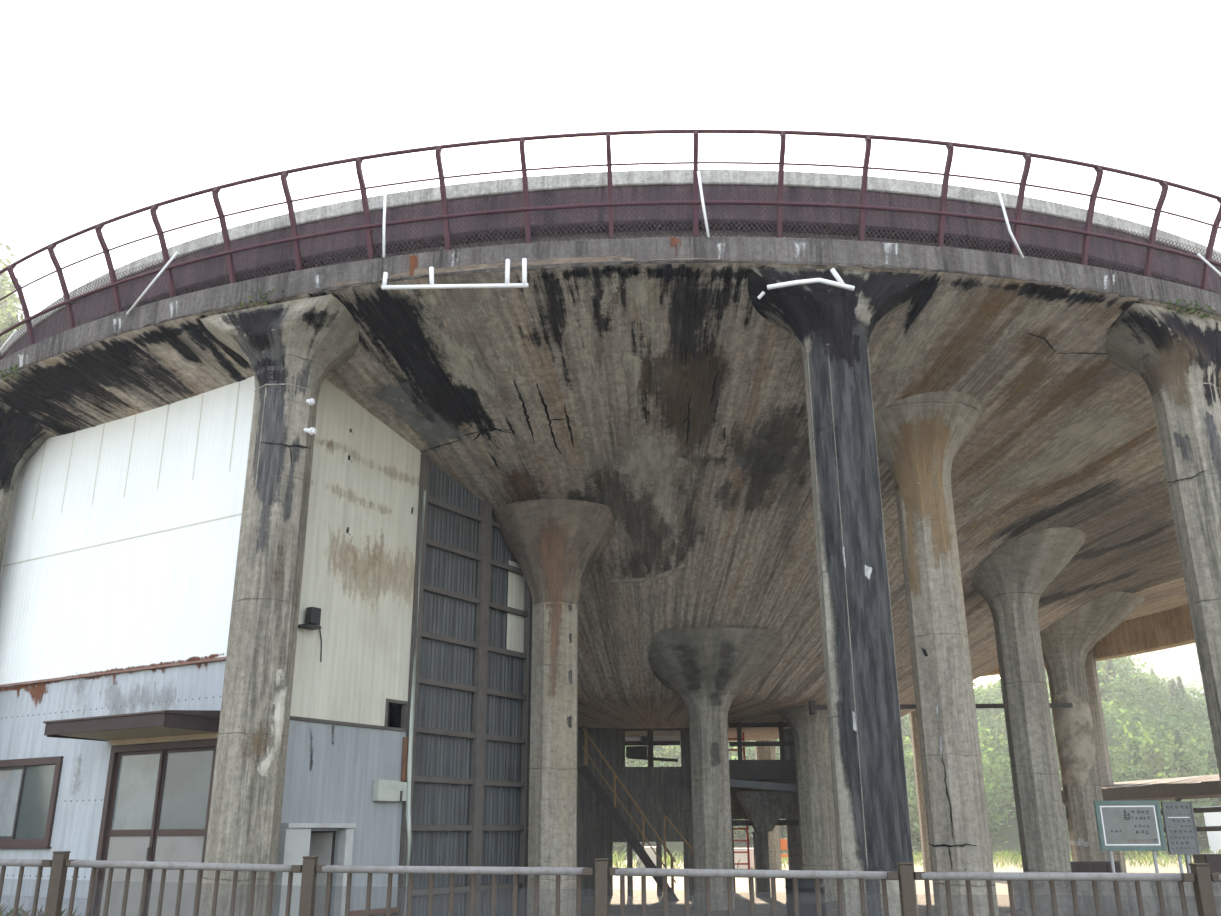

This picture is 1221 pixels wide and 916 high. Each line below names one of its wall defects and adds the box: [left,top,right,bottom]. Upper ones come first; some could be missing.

leakage [0,243,846,576]
crack [421,380,574,470]
leakage [873,274,1221,595]
leakage [1039,568,1141,605]
rust [0,653,224,707]
crack [930,751,977,870]